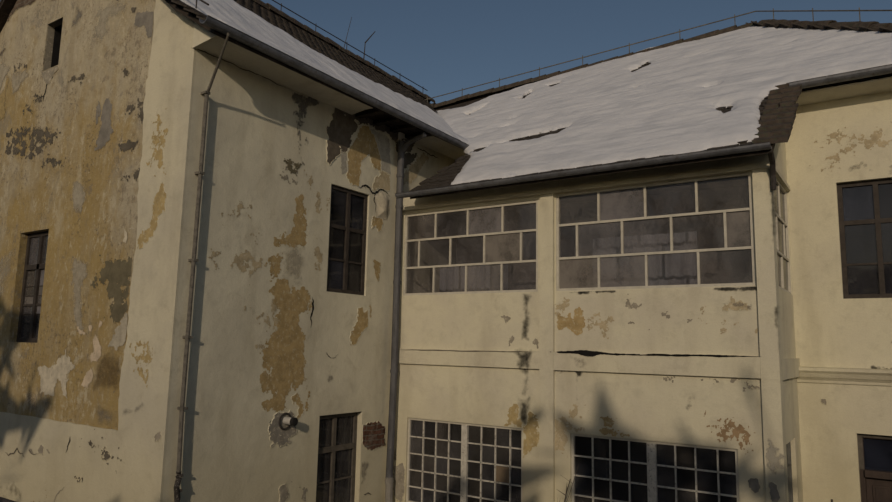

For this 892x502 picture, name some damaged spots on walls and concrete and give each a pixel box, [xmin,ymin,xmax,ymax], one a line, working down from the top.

spalling [5,126,66,169]
spalling [326,107,417,186]
peeling [814,127,892,172]
crack [359,184,388,212]
peeling [230,158,330,423]
peeling [555,297,614,339]
crack [410,346,527,354]
crack [557,349,761,357]
flaking render [362,420,386,451]
peeling [747,440,784,502]